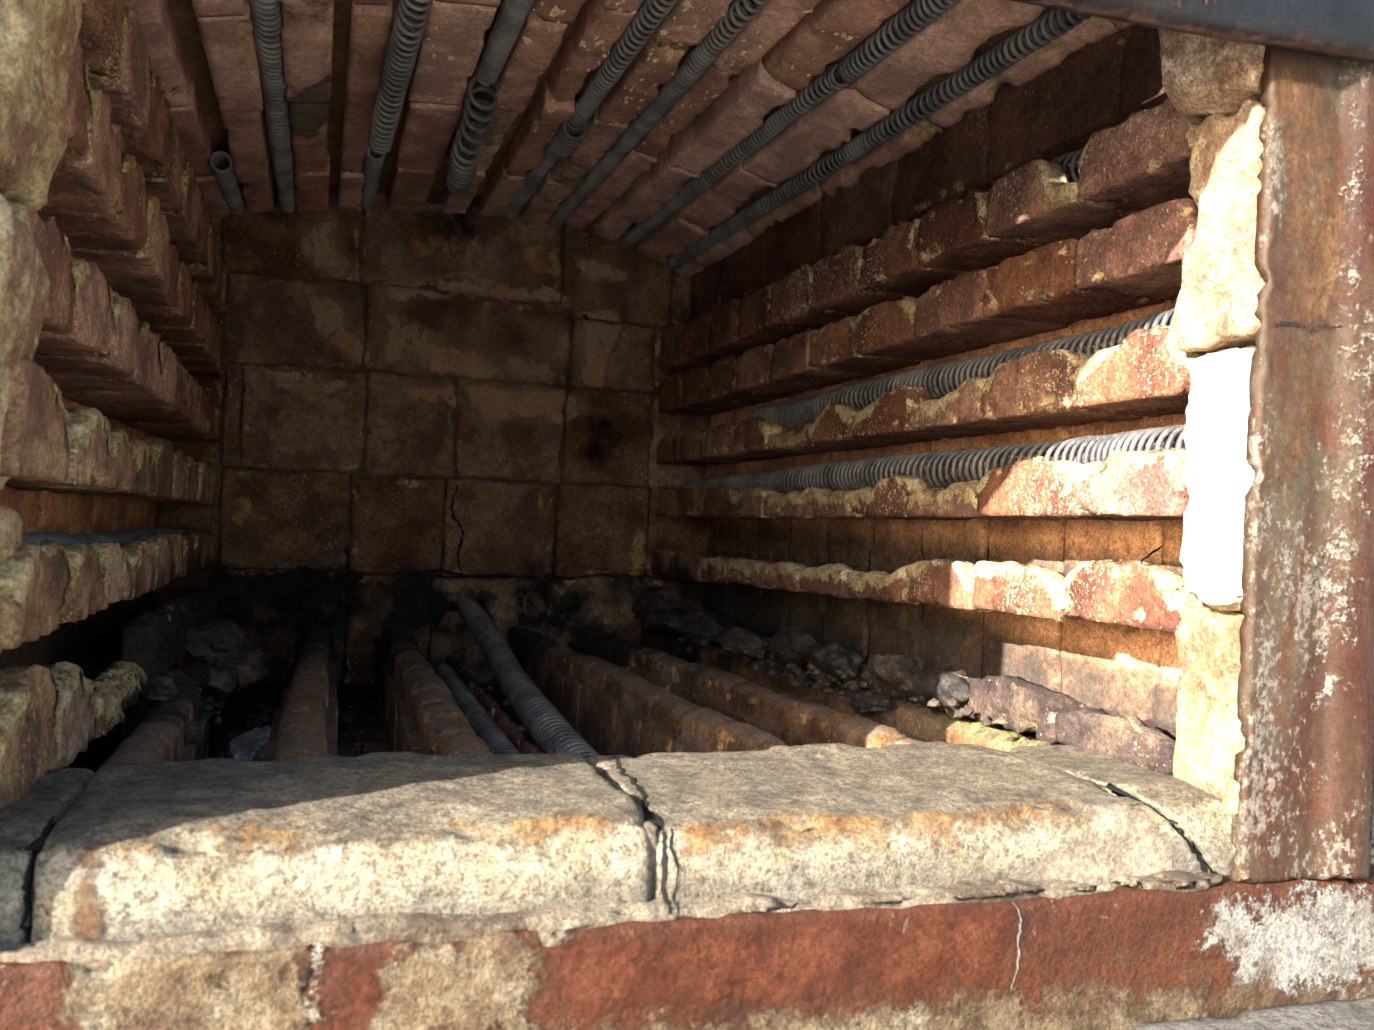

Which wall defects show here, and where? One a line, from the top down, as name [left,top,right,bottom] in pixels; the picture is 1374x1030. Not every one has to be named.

rust [1031,0,1373,482]
rust [1353,350,1374,519]
crack [391,485,552,584]
crack [15,814,57,939]
crack [613,756,680,914]
crack [1098,783,1208,873]
rust [554,903,1014,1016]